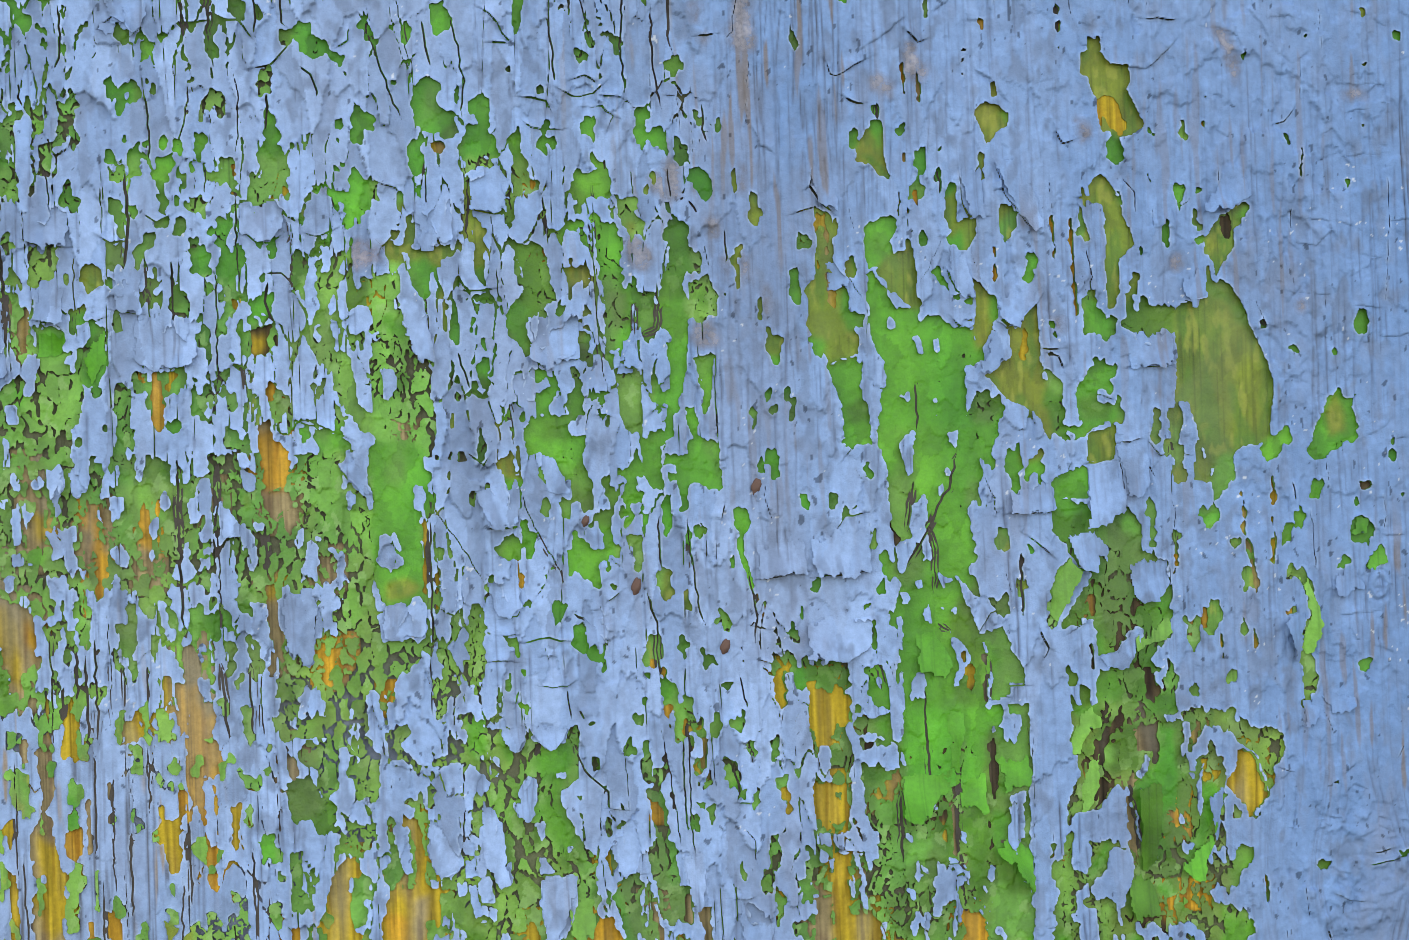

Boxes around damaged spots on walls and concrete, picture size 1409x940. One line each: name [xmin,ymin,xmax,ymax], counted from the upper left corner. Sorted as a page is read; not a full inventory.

peeling [788,28,799,51]
crack [1053,0,1071,32]
peeling [823,0,948,179]
peeling [974,81,1008,143]
peeling [1054,4,1185,165]
peeling [1178,120,1205,141]
peeling [1280,344,1311,379]
peeling [1307,387,1365,460]
peeling [1386,428,1409,462]
peeling [730,147,1295,940]